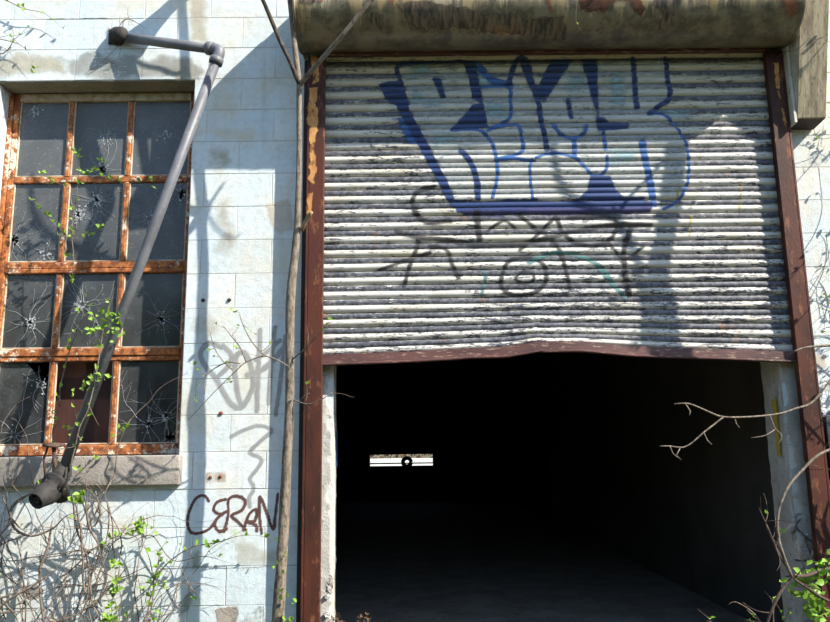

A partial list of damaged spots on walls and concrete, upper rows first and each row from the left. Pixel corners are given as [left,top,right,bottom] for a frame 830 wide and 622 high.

peeling [215,606,247,622]